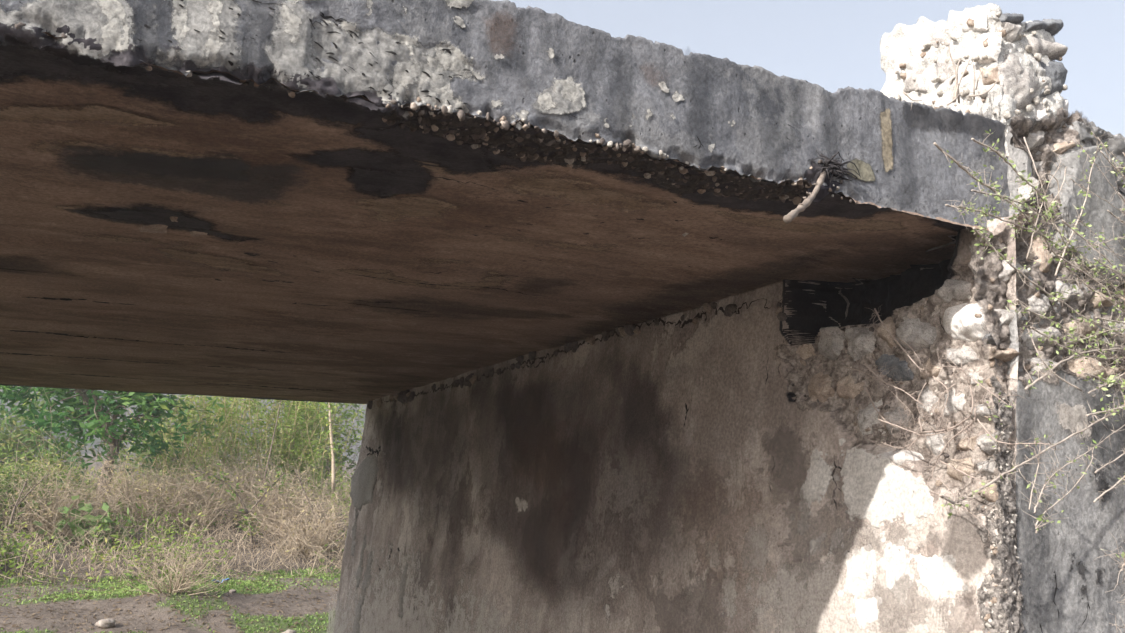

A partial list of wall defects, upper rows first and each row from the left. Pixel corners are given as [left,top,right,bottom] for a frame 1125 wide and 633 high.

spalling [0,0,875,205]
damp [0,34,968,231]
damp [65,204,255,241]
peeling [353,196,457,221]
spalling [706,108,1125,633]
damp [1090,464,1111,502]
damp [1070,553,1105,595]